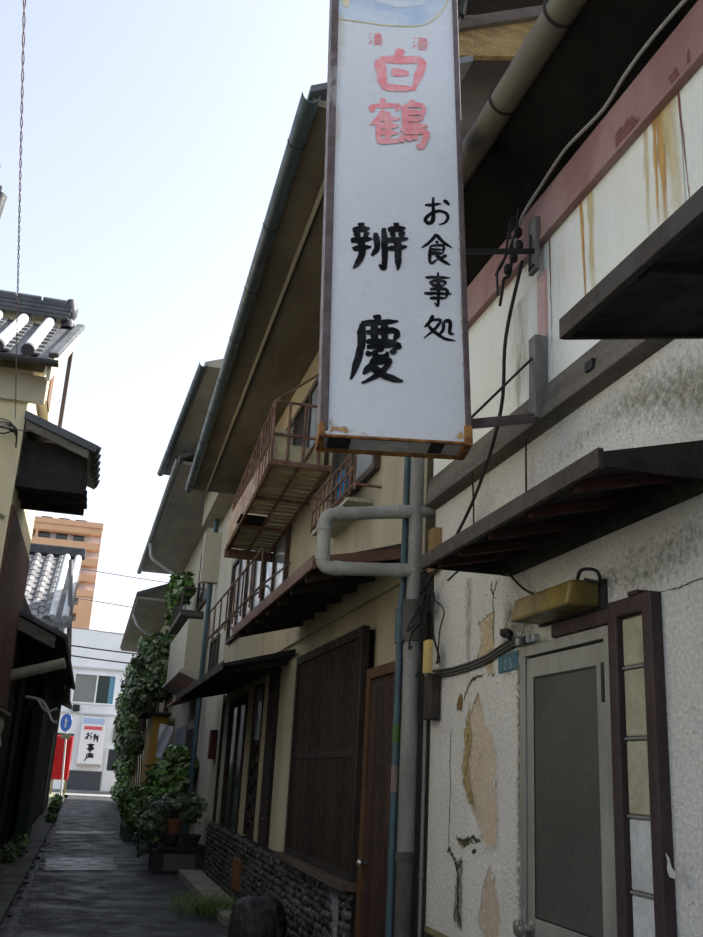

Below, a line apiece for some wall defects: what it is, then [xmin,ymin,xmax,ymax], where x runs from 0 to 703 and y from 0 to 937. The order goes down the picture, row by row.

rust [644,92,690,210]
rust [580,191,593,295]
peeling [477,613,495,677]
peeling [462,692,497,854]
peeling [479,867,501,937]